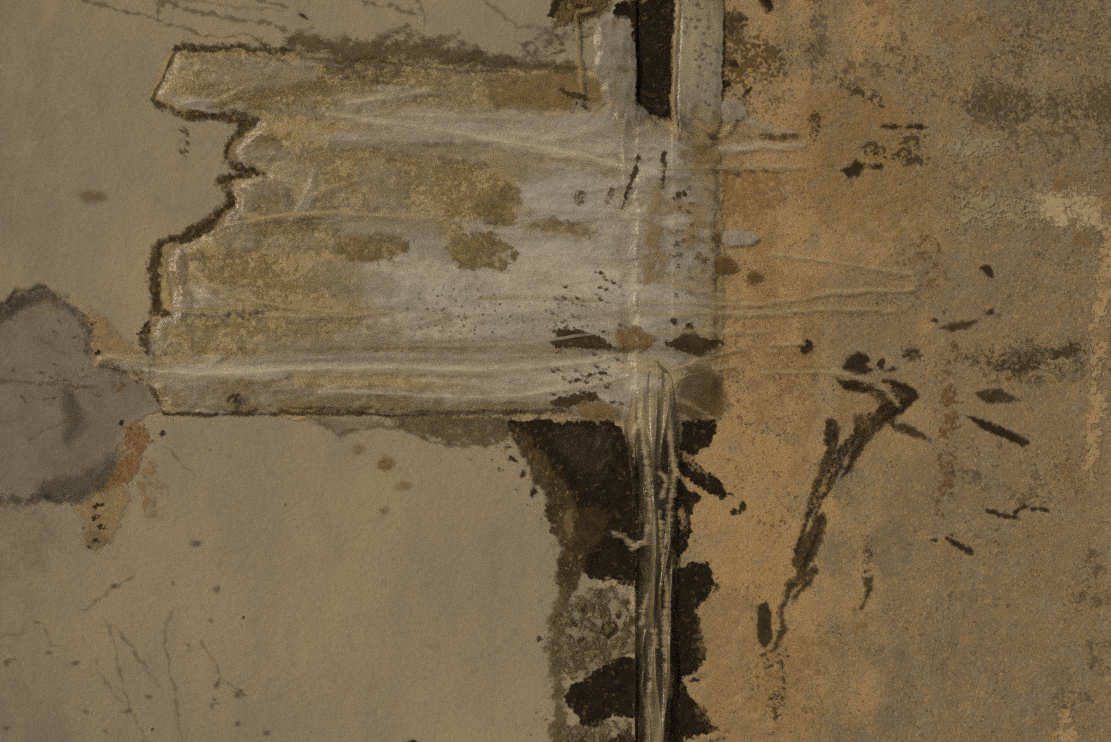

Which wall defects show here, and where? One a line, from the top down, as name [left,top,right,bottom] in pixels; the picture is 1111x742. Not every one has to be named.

water stain [721,19,788,97]
peeling [0,42,642,504]
water stain [873,186,1111,490]
water stain [772,438,849,651]
water stain [535,587,568,742]